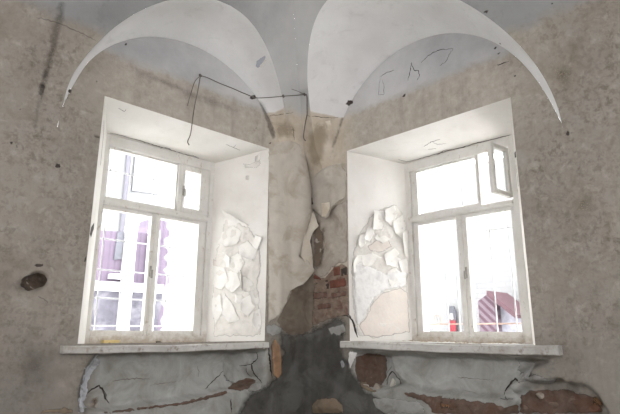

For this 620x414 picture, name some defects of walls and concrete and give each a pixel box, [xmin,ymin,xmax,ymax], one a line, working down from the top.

spalling [20,264,47,291]
peeling [212,209,262,337]
peeling [278,201,410,338]
crack [87,378,176,403]
damp [239,318,385,414]
flaking render [348,351,387,392]
spalling [516,359,602,414]